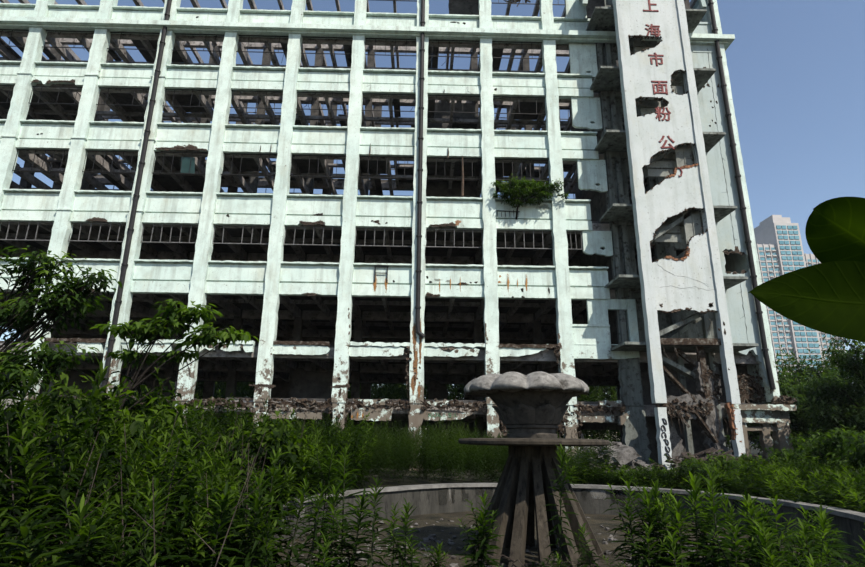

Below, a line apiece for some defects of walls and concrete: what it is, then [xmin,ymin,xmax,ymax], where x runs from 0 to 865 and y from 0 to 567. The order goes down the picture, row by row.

spalling [635,70,688,116]
spalling [645,163,699,194]
spalling [650,207,708,262]
spalling [658,303,718,314]
corrosion [411,318,422,398]
flaking render [725,402,742,442]